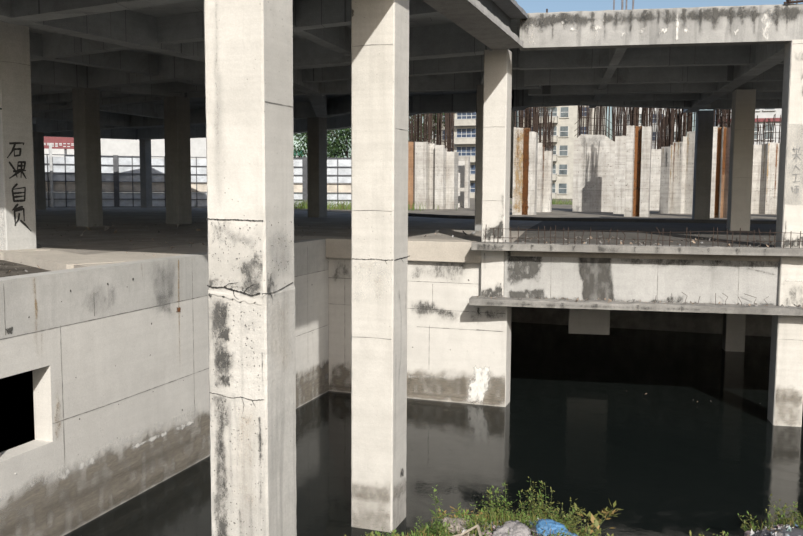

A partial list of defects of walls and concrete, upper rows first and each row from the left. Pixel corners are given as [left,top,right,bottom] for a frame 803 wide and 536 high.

leakage [520,5,801,40]
rust [514,129,529,215]
rust [633,127,642,216]
leakage [212,301,263,386]
crack [207,282,293,303]
leakage [296,361,351,408]
leakage [416,302,453,316]
leakage [407,372,505,405]
leakage [477,215,615,318]
leakage [0,397,264,536]